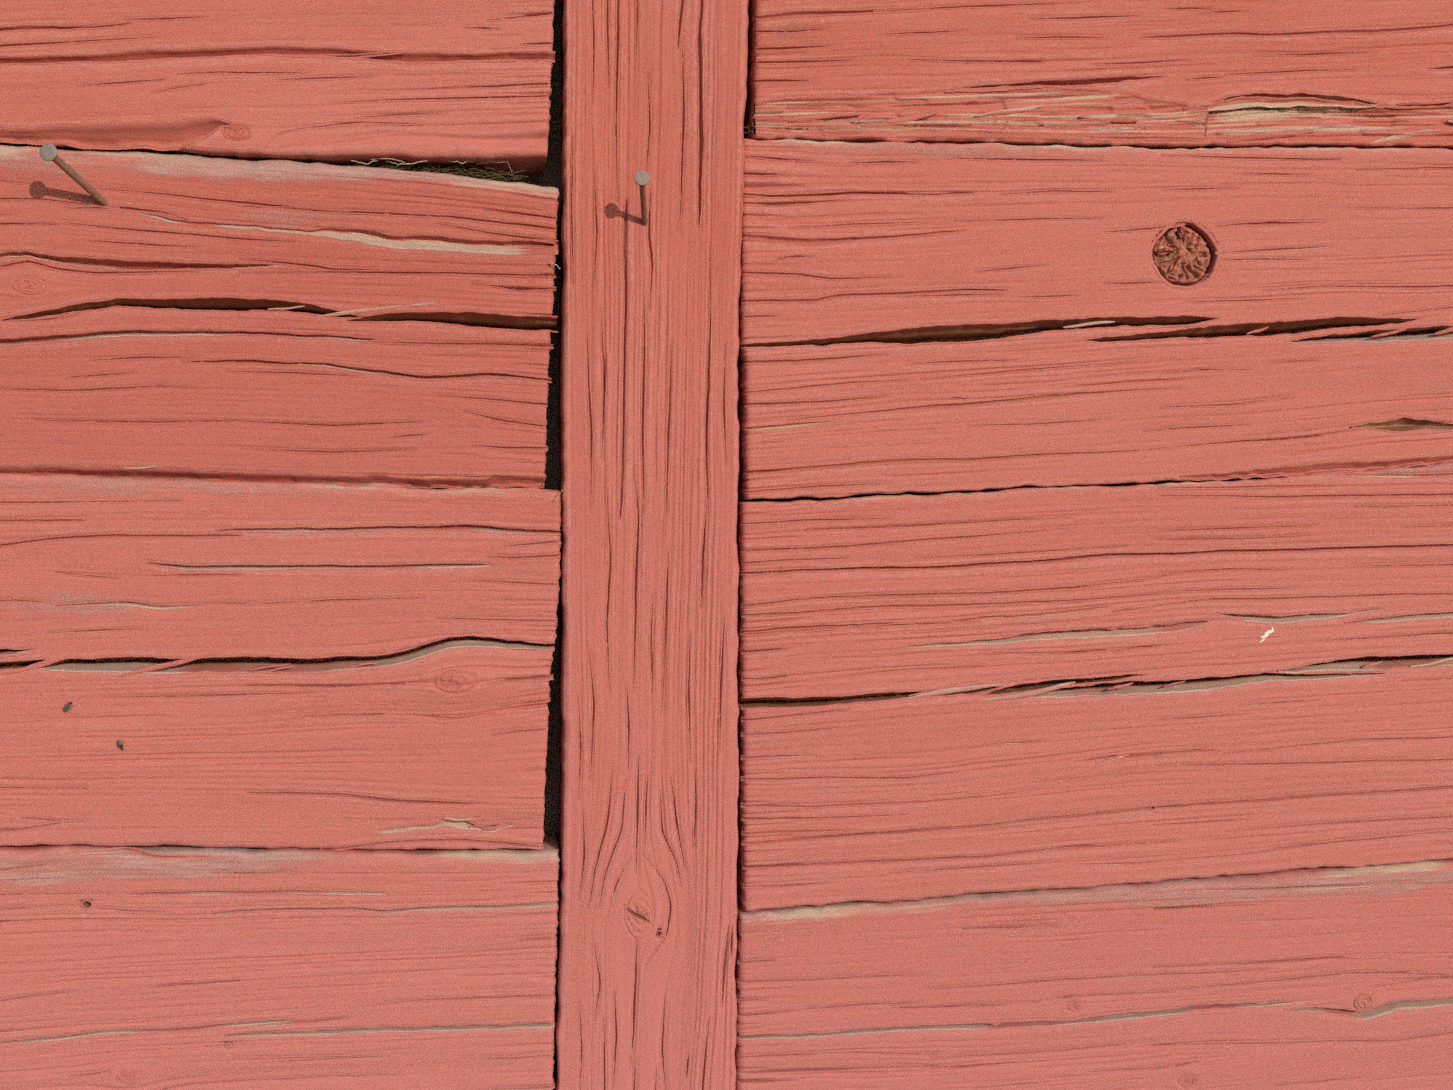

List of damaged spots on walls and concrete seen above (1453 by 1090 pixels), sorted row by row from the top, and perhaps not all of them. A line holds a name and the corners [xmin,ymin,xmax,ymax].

crack [676,0,705,231]
crack [755,0,1453,111]
crack [0,0,698,1090]
crack [700,154,1453,889]